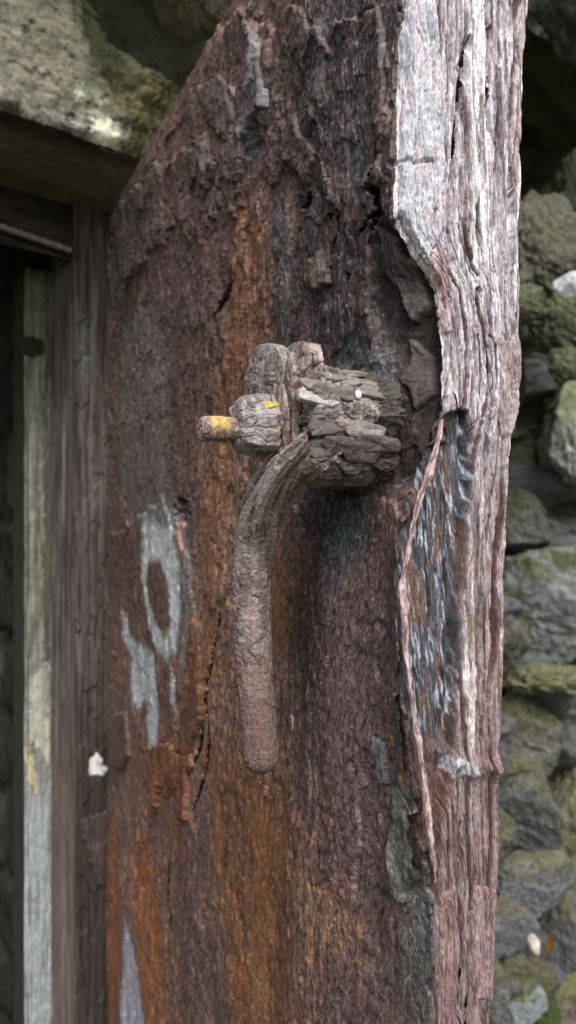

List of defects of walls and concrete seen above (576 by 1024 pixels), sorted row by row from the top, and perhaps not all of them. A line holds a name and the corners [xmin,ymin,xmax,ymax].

crack [451,27,497,188]
rust [216,209,275,417]
rust [145,442,234,822]
crack [192,611,221,810]